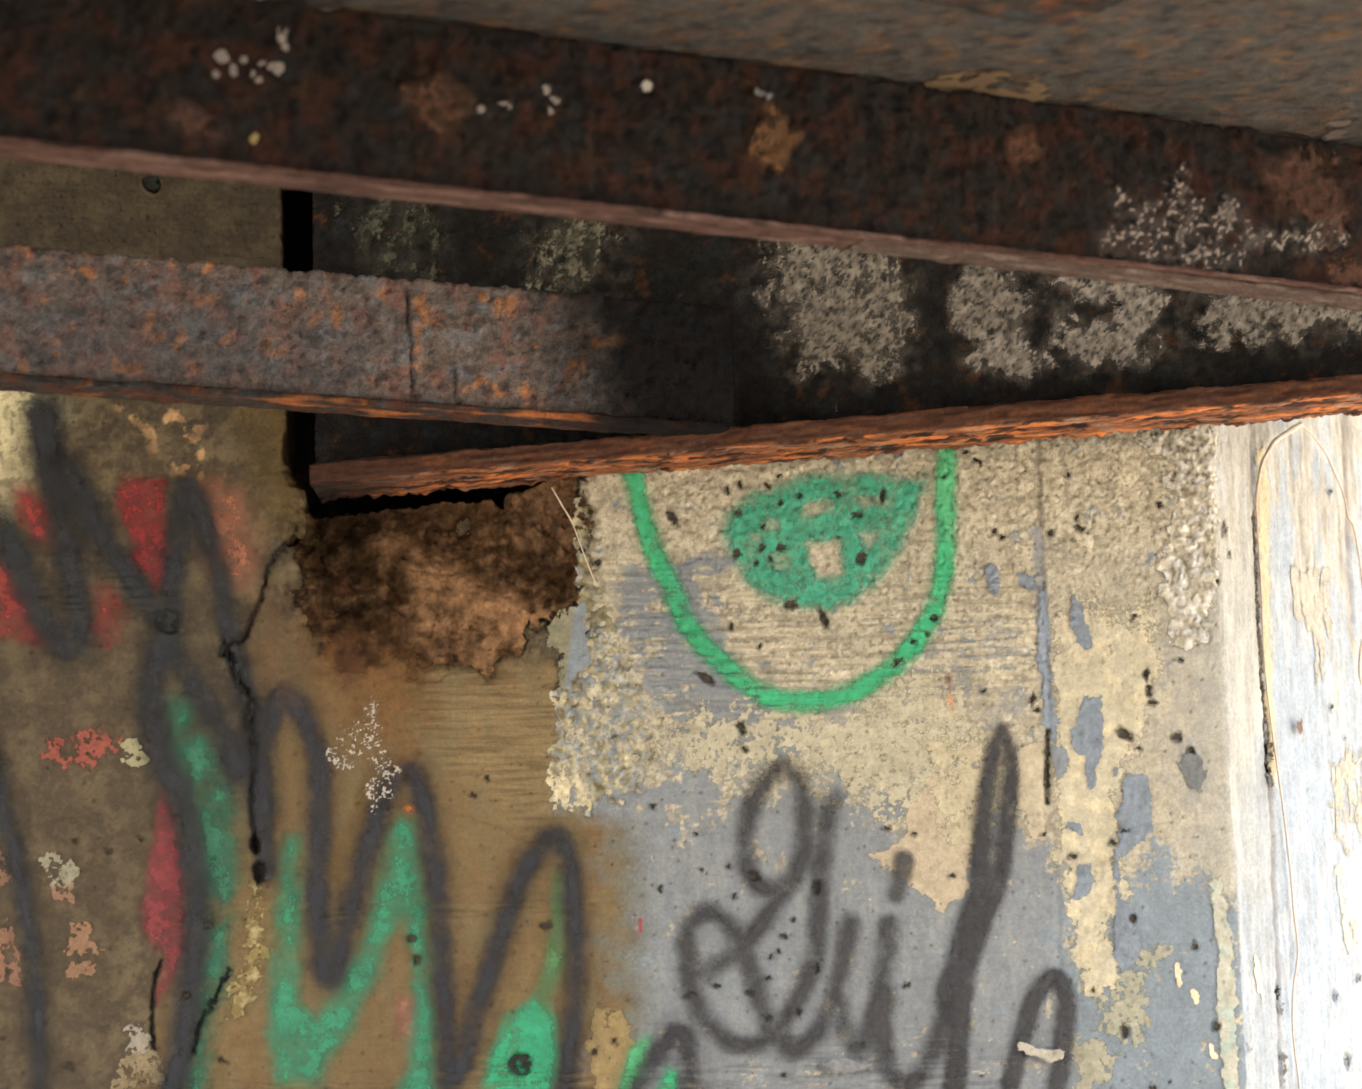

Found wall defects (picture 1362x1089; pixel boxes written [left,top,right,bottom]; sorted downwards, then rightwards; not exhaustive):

rust [399,70,471,138]
rust [747,101,801,173]
rust [1006,126,1042,166]
efflorescence [1098,164,1351,273]
rust [1255,147,1362,287]
water stain [752,239,916,386]
water stain [947,266,1171,384]
water stain [1195,294,1362,352]
crack [219,542,293,837]
spalling [286,476,1200,1089]
peeling [1172,732,1208,793]
peeling [1208,876,1252,1089]